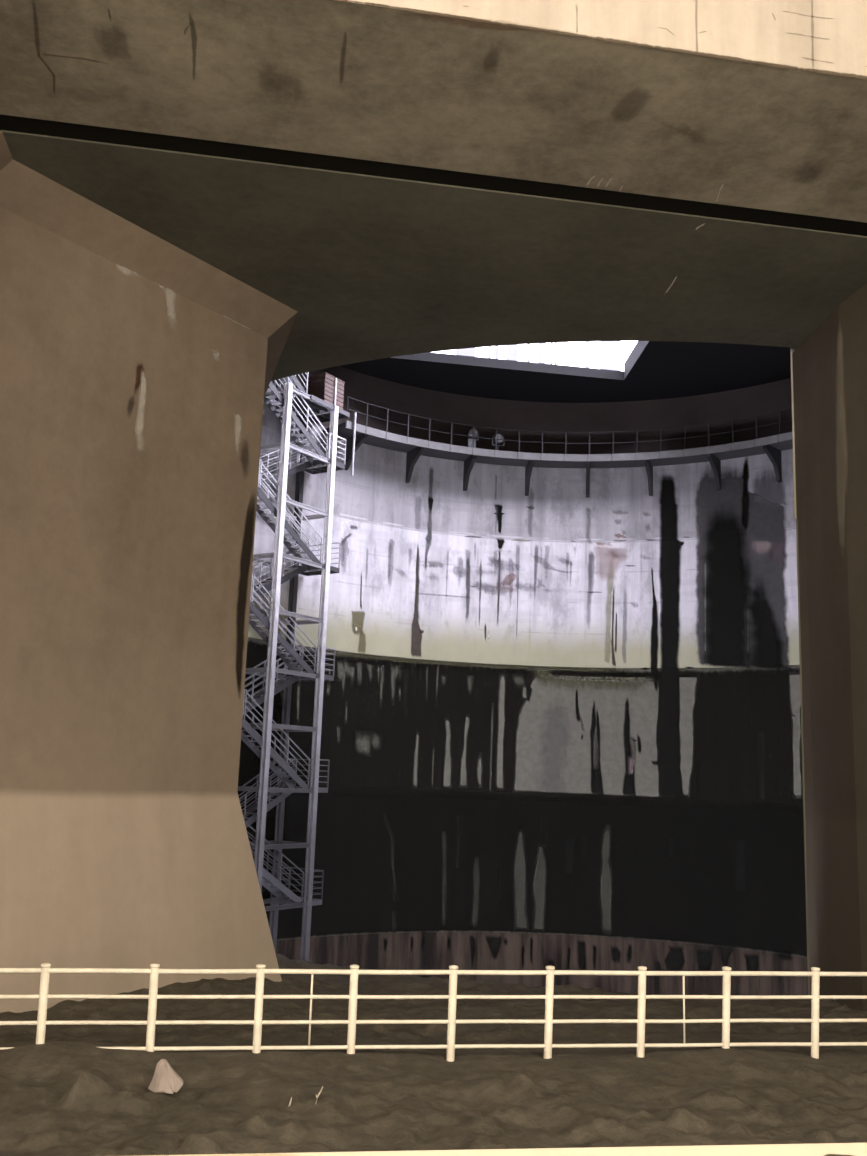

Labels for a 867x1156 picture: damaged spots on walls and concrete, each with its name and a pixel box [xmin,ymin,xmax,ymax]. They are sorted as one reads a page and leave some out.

water stain [236,460,807,971]